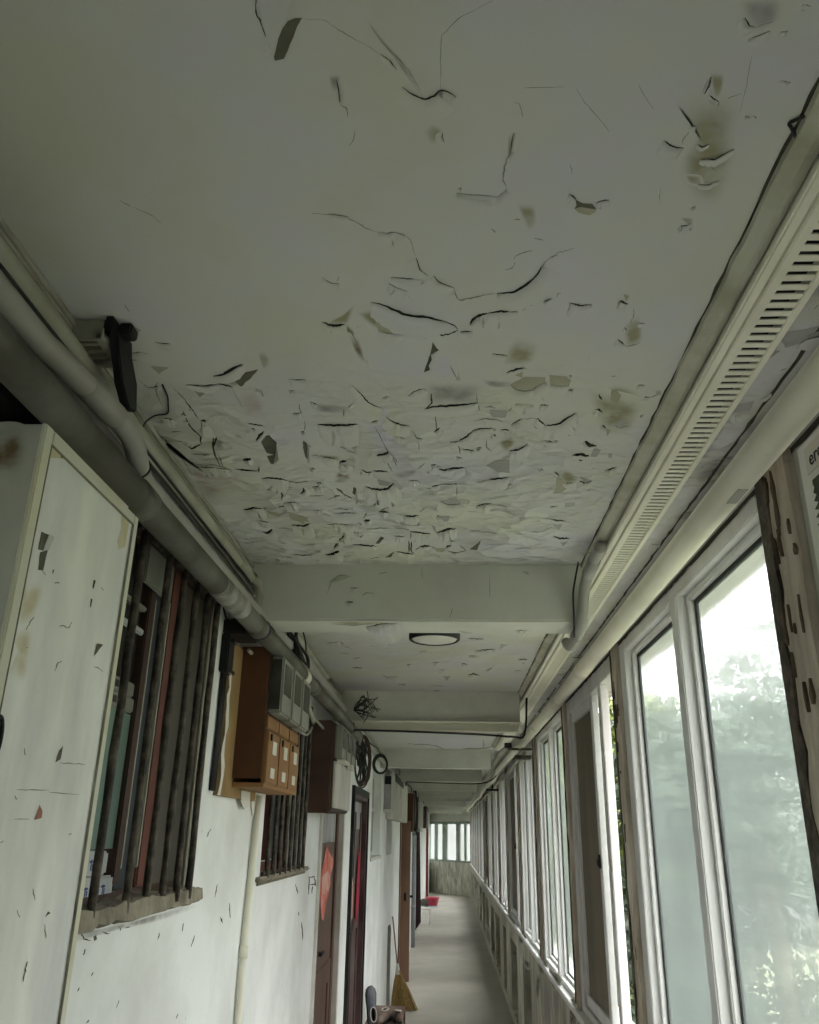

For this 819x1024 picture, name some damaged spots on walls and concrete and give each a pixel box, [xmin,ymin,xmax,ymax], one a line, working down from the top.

crack [328,73,355,146]
crack [359,1,492,123]
damp [656,82,757,215]
crack [312,213,484,301]
peeling [614,293,645,351]
peeling [132,341,279,504]
peeling [244,248,593,565]
spalling [535,441,617,546]
peeling [688,449,739,488]
spalling [7,532,54,687]
peeling [322,621,403,644]